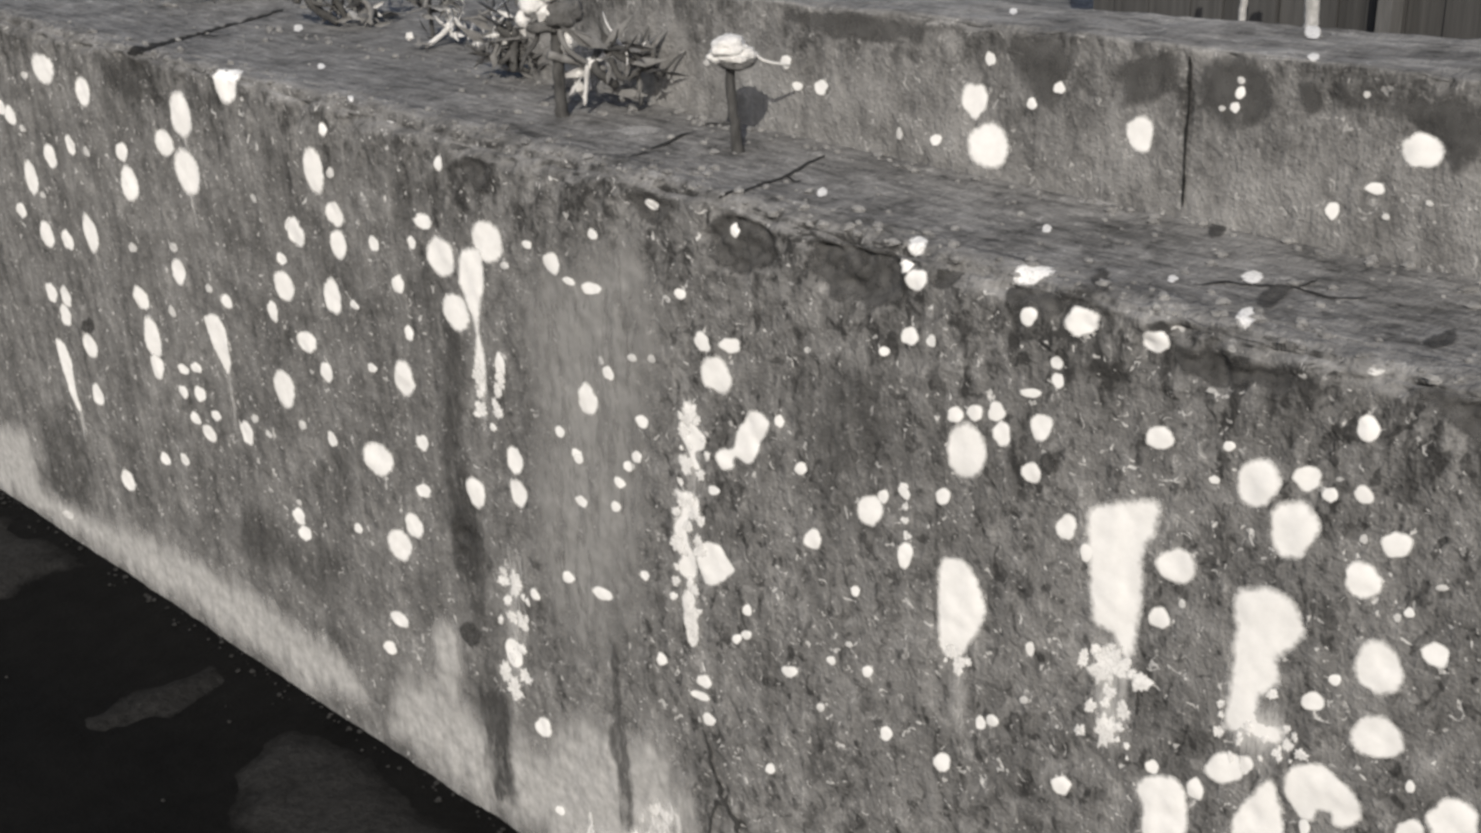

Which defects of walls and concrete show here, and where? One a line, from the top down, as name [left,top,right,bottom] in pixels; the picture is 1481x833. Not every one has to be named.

damp [391,245,694,833]
crack [701,729,740,833]